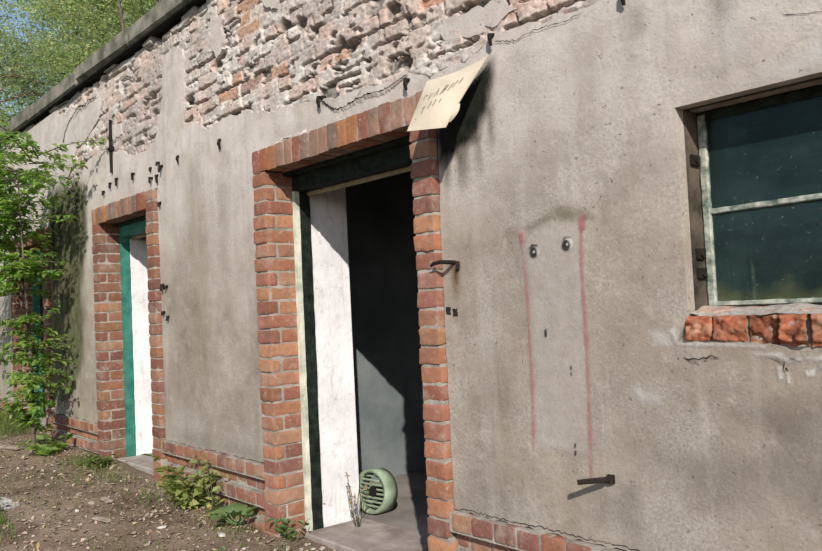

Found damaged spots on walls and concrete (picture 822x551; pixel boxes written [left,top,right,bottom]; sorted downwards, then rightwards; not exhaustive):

crack [495,13,582,42]
flaking render [59,0,600,188]
crack [321,74,408,113]